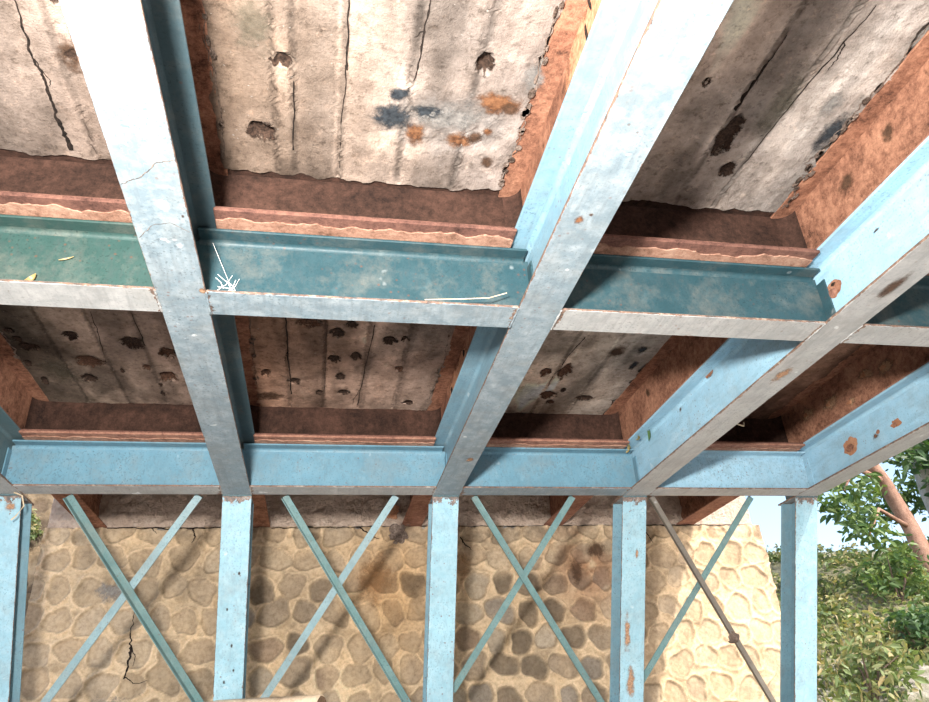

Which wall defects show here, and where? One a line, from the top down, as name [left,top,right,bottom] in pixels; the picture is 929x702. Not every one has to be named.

crack [14,0,73,150]
crack [339,0,350,168]
leakage [373,89,441,130]
spalling [476,53,495,77]
rust [480,92,520,114]
crack [734,5,877,174]
spalling [245,121,275,142]
rust [447,129,491,146]
spalling [707,113,747,177]
rust [843,436,858,456]
crack [123,612,147,684]
rust [627,667,635,696]